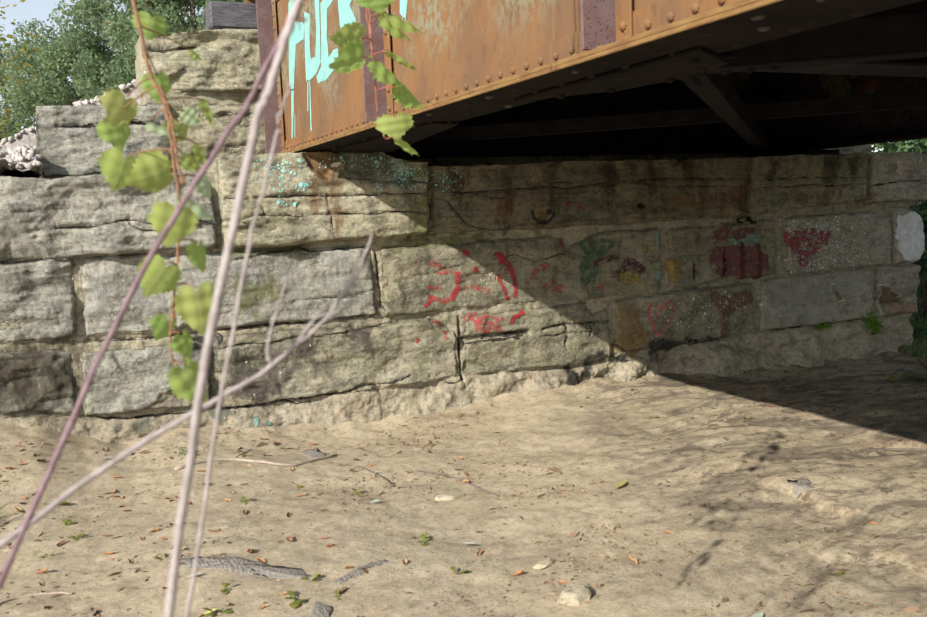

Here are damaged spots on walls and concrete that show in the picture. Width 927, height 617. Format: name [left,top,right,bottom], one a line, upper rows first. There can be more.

crack [65,121,96,129]
damp [339,152,395,183]
crack [56,219,154,231]
crack [88,168,920,350]
crack [447,318,649,388]
crack [227,376,410,409]
crack [89,411,187,419]